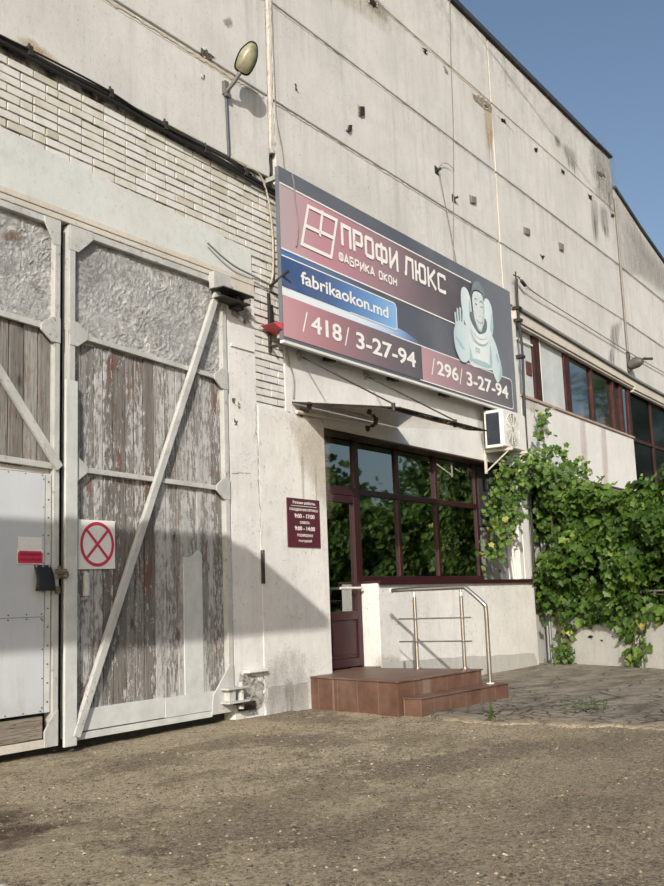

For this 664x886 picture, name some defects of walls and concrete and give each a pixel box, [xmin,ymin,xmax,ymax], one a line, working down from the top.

flaking render [237,673,268,714]
crack [473,676,664,723]